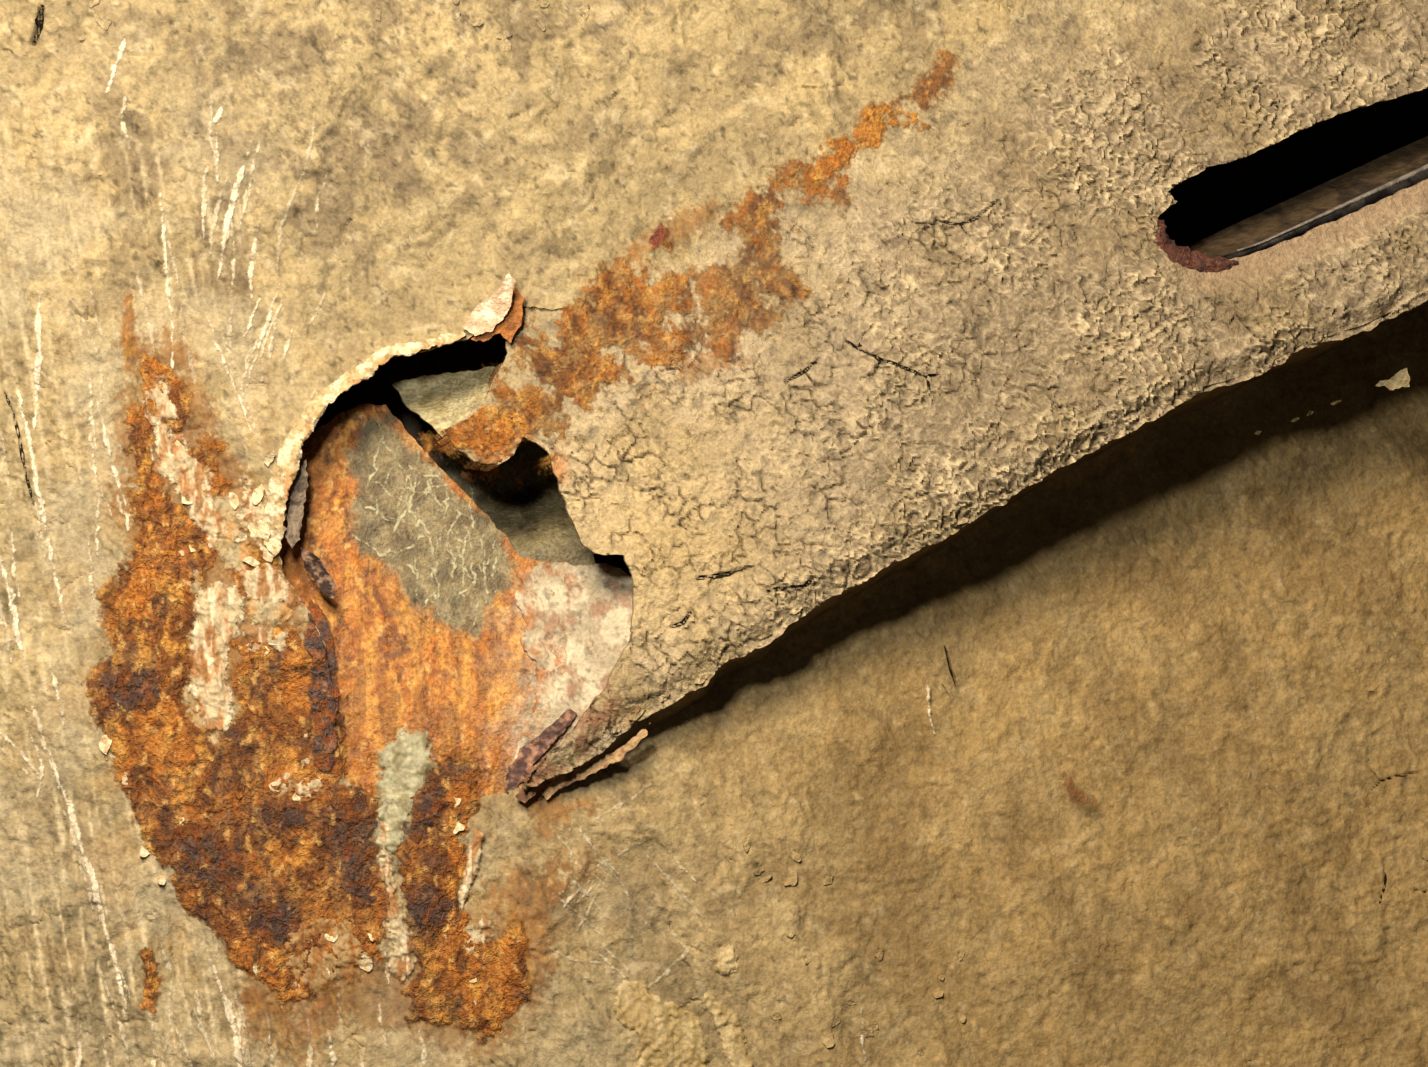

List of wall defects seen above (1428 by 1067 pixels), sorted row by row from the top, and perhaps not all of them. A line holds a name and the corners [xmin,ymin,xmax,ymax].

crack [936,203,996,234]
corrosion [418,49,959,484]
crack [784,360,817,382]
crack [845,333,939,400]
peeling [145,375,302,734]
crack [670,567,816,628]
corrosion [81,350,531,1044]
crack [942,646,956,697]
peeling [269,758,322,801]
peeling [284,728,437,992]
peeling [453,797,485,908]
peeling [463,919,494,955]